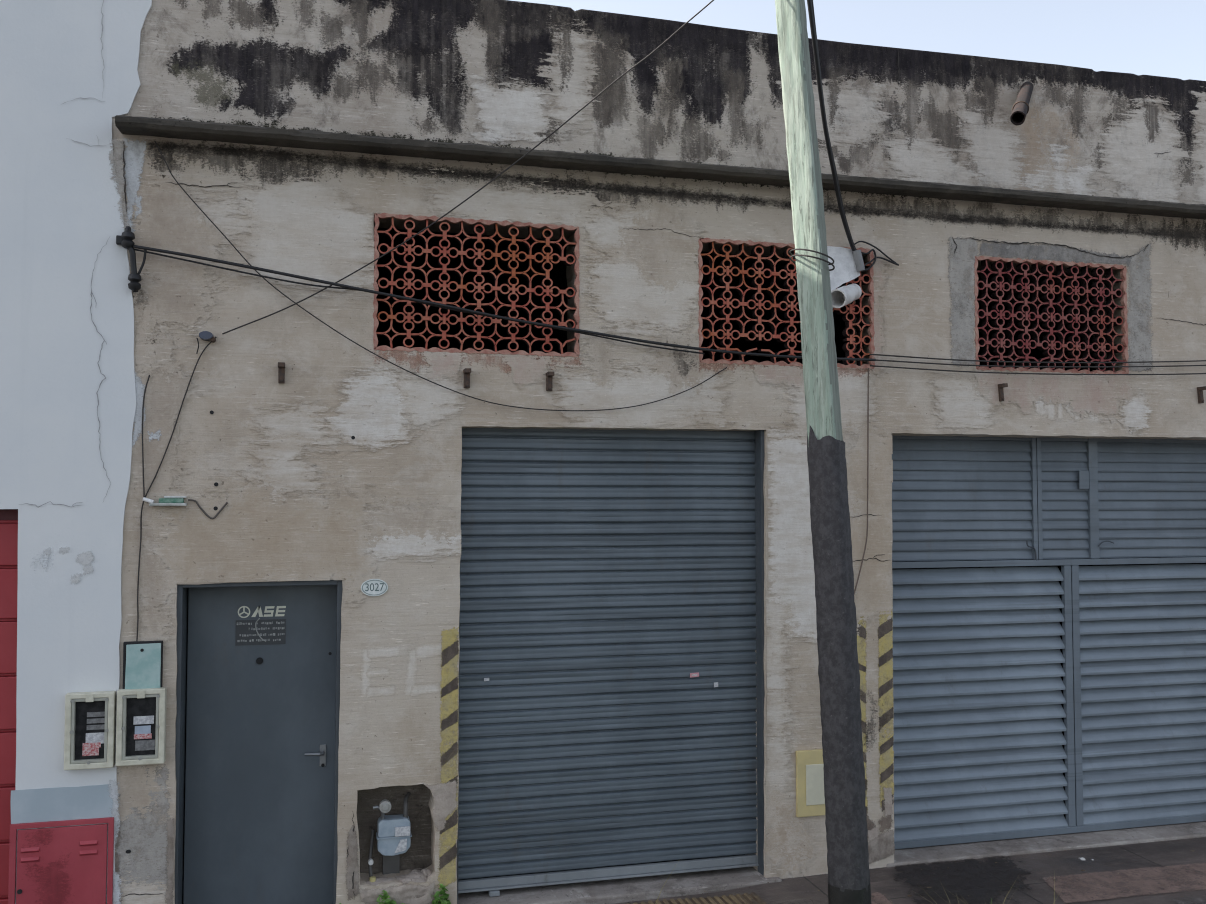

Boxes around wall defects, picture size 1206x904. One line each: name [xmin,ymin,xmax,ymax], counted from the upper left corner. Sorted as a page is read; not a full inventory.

crack [65,0,105,103]
crack [66,137,127,212]
damp [166,0,785,163]
damp [808,38,1206,250]
crack [19,237,111,507]
damp [120,140,792,654]
spalling [346,824,435,904]
spalling [425,781,457,831]